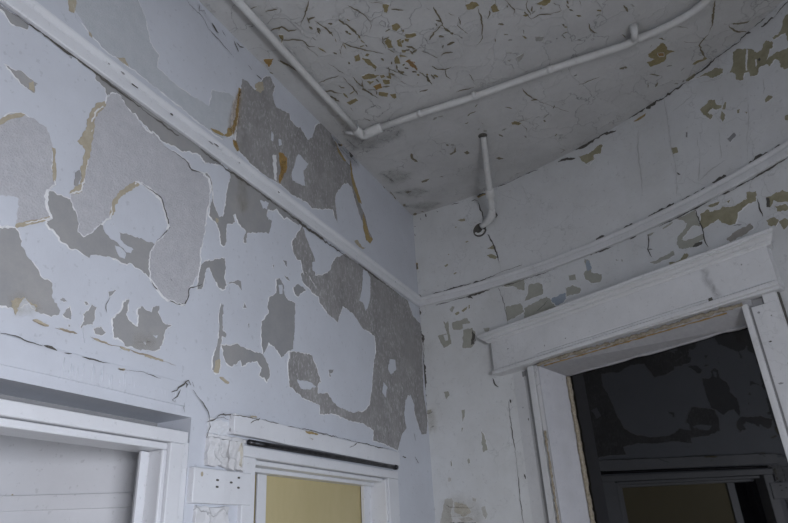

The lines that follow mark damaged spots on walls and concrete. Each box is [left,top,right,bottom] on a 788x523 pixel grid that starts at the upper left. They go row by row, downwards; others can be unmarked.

peeling [270,1,468,111]
peeling [465,0,581,44]
peeling [646,38,674,87]
crack [630,2,787,192]
peeling [675,1,788,84]
crack [558,130,616,162]
crack [624,80,787,239]
peeling [0,0,432,452]
peeling [647,190,788,265]
peeling [437,305,490,348]
peeling [499,259,602,322]
crack [1,319,419,463]